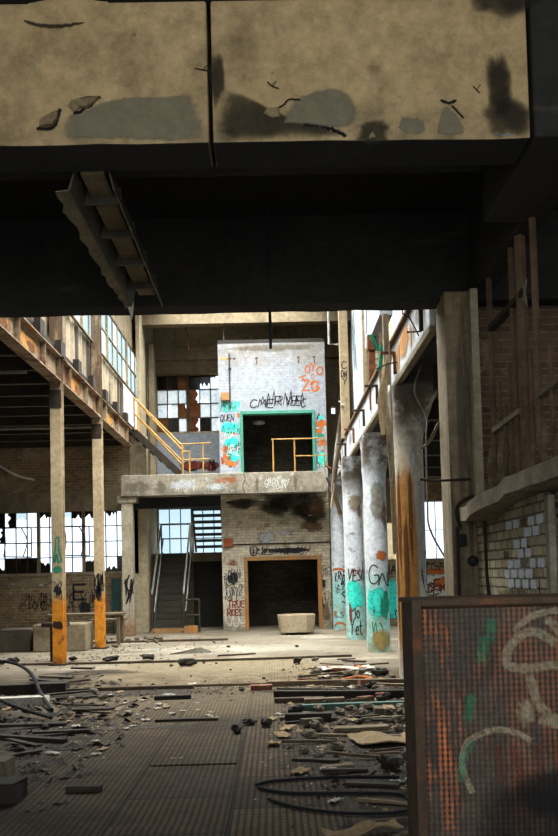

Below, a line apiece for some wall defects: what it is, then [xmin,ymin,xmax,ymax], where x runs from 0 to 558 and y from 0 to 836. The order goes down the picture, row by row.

leakage [209,57,224,102]
leakage [222,96,329,138]
spalling [264,89,355,137]
leakage [359,122,387,144]
spalling [399,118,425,134]
spalling [438,99,464,134]
rust [396,468,419,652]